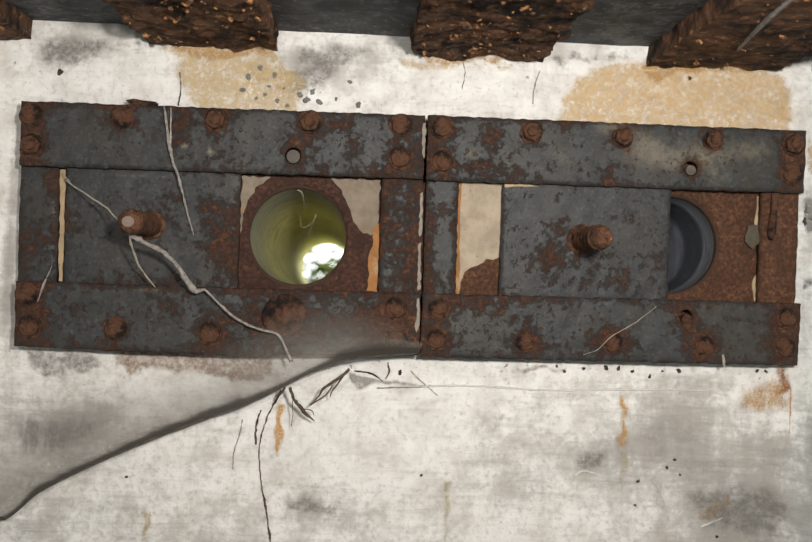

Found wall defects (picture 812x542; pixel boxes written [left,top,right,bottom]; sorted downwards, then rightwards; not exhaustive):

corrosion [366,223,380,292]
corrosion [745,369,791,416]
corrosion [275,405,283,452]
crack [232,390,282,542]